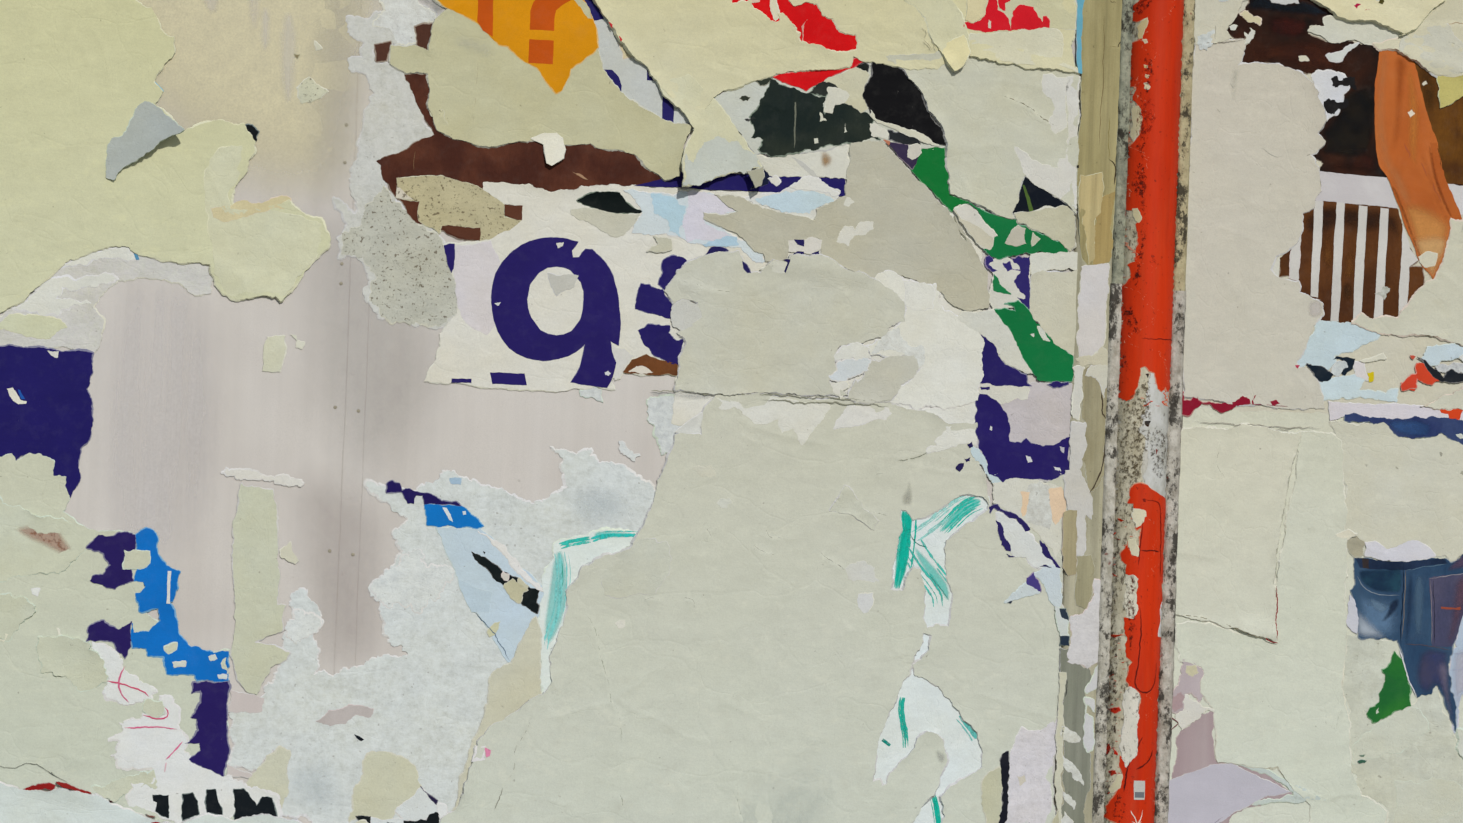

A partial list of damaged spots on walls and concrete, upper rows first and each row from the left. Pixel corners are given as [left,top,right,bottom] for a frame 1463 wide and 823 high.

peeling [414,22,433,50]
peeling [1137,17,1148,43]
peeling [374,41,392,63]
peeling [1129,106,1142,142]
peeling [530,133,566,166]
peeling [1132,208,1142,223]
peeling [1005,225,1040,247]
peeling [122,549,151,570]
peeling [163,642,187,668]